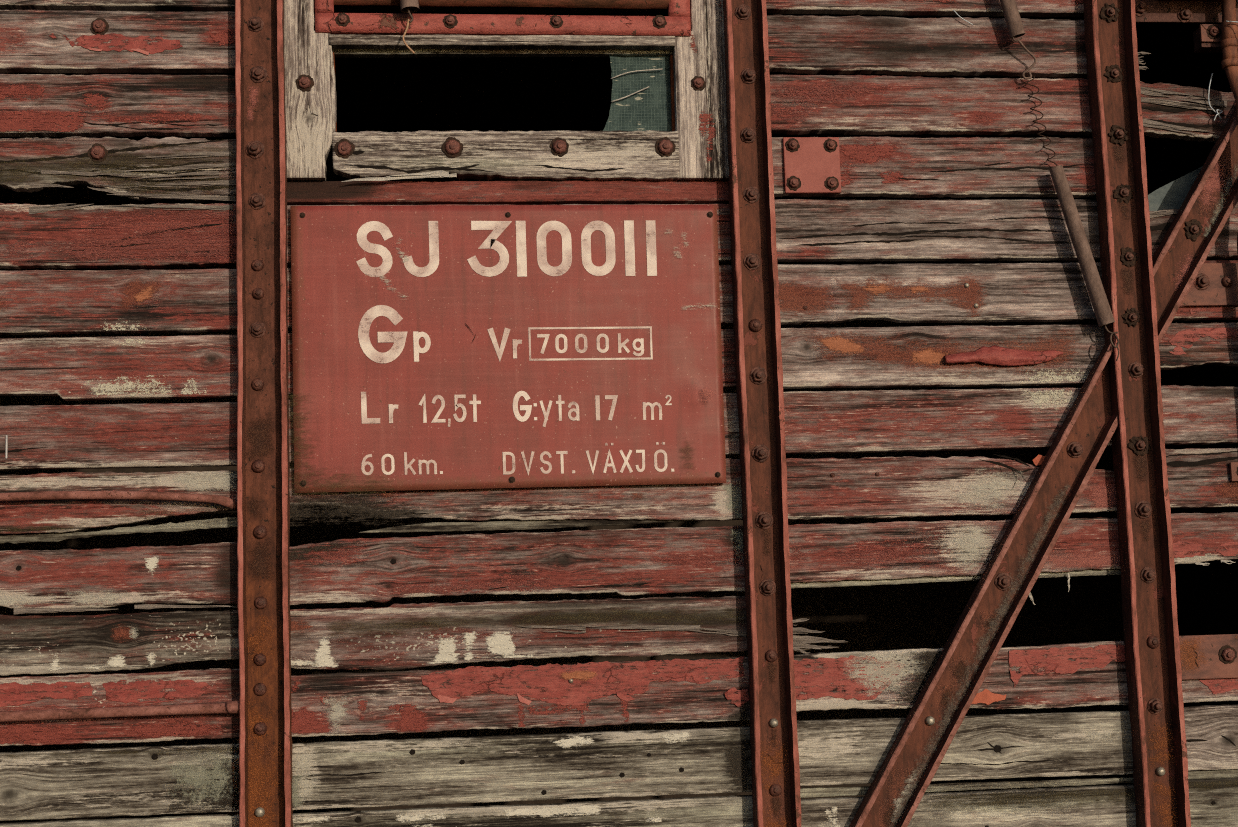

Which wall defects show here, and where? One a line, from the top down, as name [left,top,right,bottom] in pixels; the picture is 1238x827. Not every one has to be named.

peeling [49,33,183,55]
crack [0,120,227,191]
crack [59,223,231,252]
peeling [1169,308,1238,355]
rust [815,331,1075,371]
peeling [912,345,1063,366]
rust [1048,554,1119,567]
peeling [0,679,210,707]
peeling [421,656,745,706]
peeling [972,644,1125,705]
peeling [129,718,219,738]